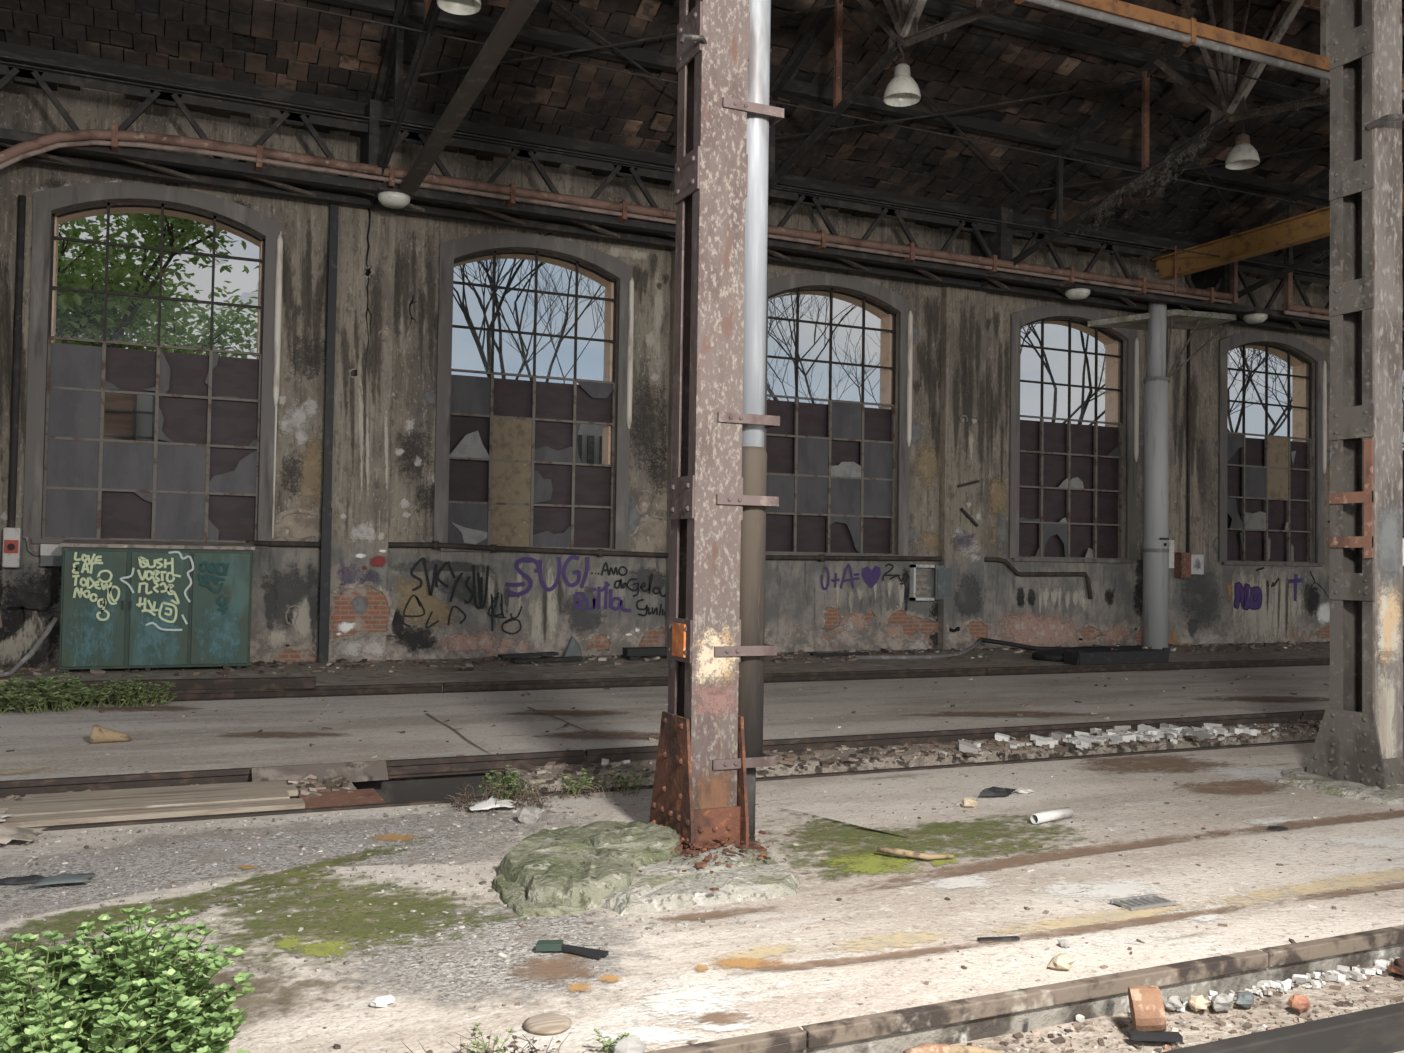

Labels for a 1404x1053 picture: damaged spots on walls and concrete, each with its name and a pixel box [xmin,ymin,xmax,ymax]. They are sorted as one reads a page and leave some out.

damp [281,226,438,516]
crack [364,208,372,390]
crack [407,295,418,330]
damp [603,246,669,495]
damp [913,298,1009,545]
damp [261,565,319,649]
flaking render [269,579,396,662]
flaking render [821,604,993,644]